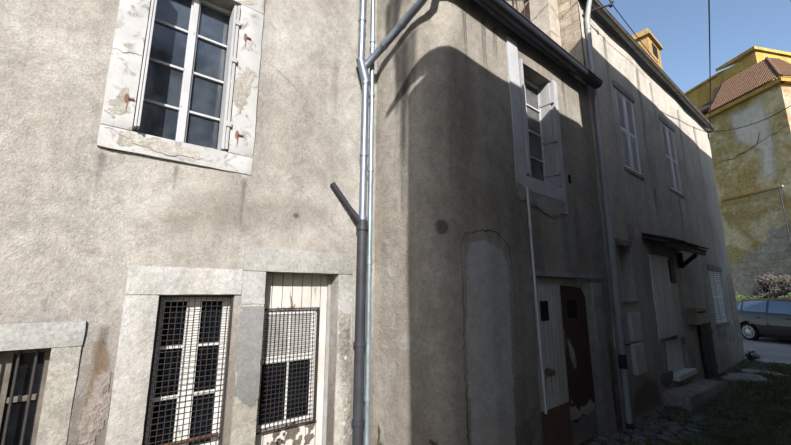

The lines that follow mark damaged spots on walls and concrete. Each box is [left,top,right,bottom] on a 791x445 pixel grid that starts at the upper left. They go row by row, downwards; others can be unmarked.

flaking render [77,340,111,445]
peeling [267,419,317,445]